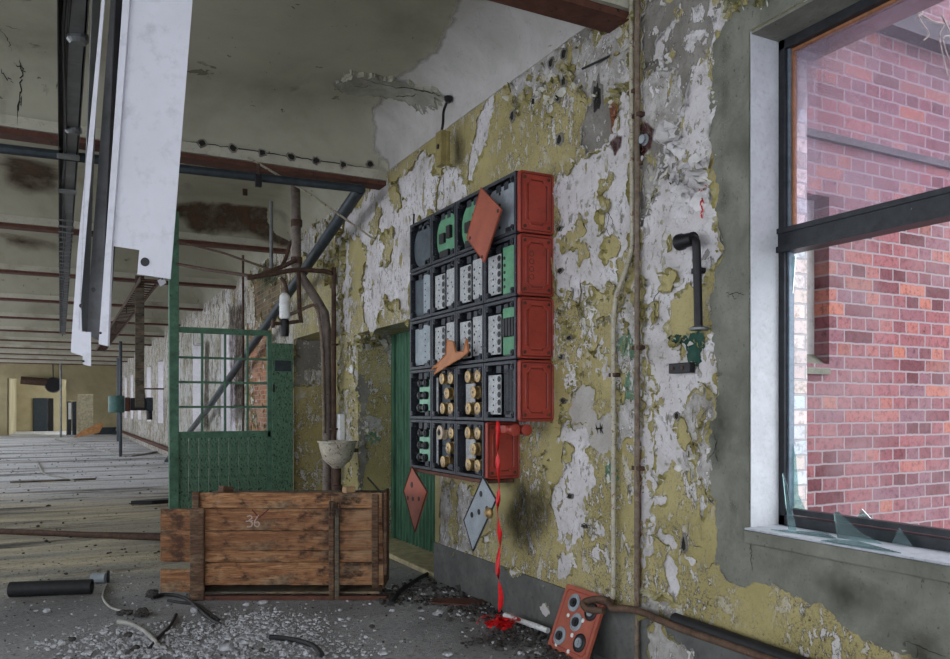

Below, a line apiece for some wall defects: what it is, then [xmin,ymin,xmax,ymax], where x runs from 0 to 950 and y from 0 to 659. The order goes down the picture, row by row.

crack [1,26,26,130]
damp [2,158,57,191]
damp [176,202,289,246]
peeling [301,0,768,659]